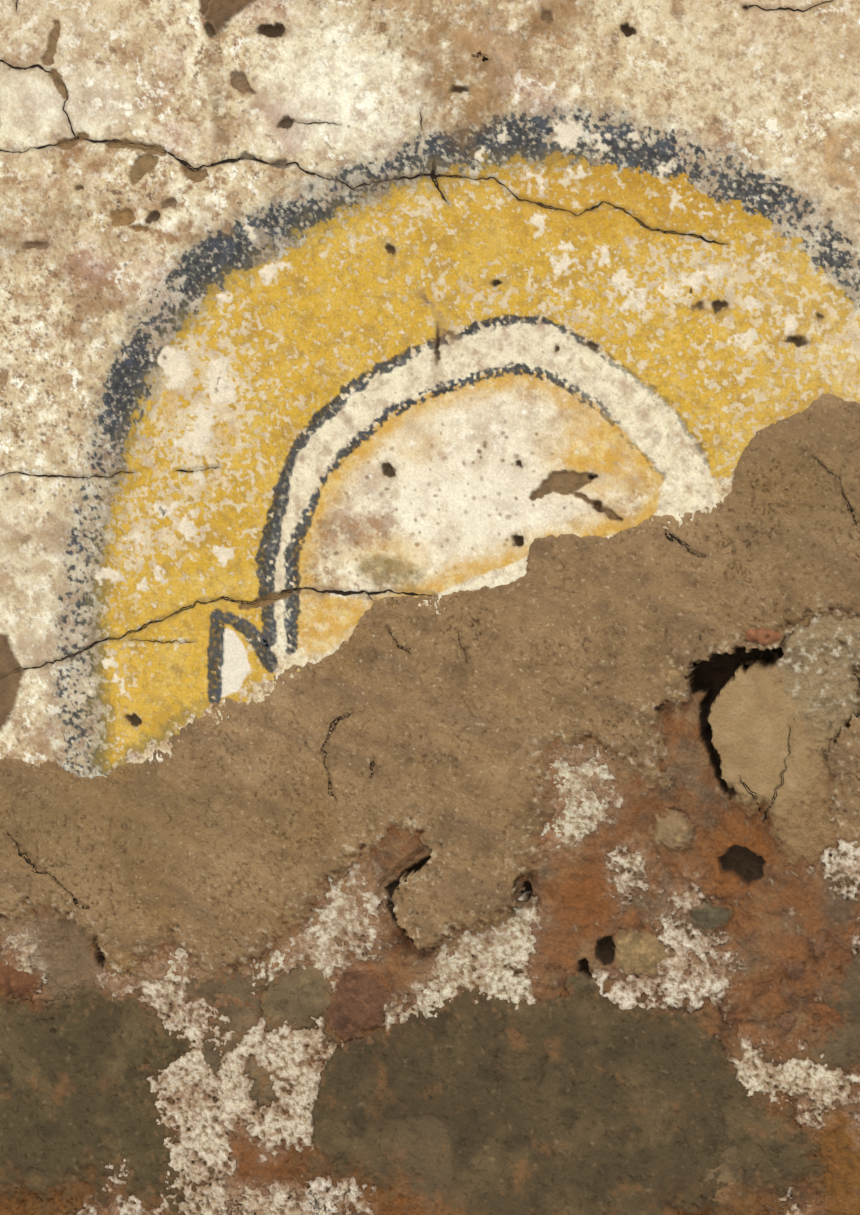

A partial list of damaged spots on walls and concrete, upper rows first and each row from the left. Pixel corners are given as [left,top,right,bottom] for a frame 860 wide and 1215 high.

crack [0,60,728,245]
peeling [158,347,191,389]
peeling [173,356,243,486]
spalling [382,463,396,478]
spalling [530,470,623,521]
peeling [212,544,234,566]
peeling [95,566,167,597]
crack [1,587,431,679]
flaking render [690,614,860,868]
spalling [719,845,764,882]
spalling [385,856,431,940]
spalling [579,936,615,975]